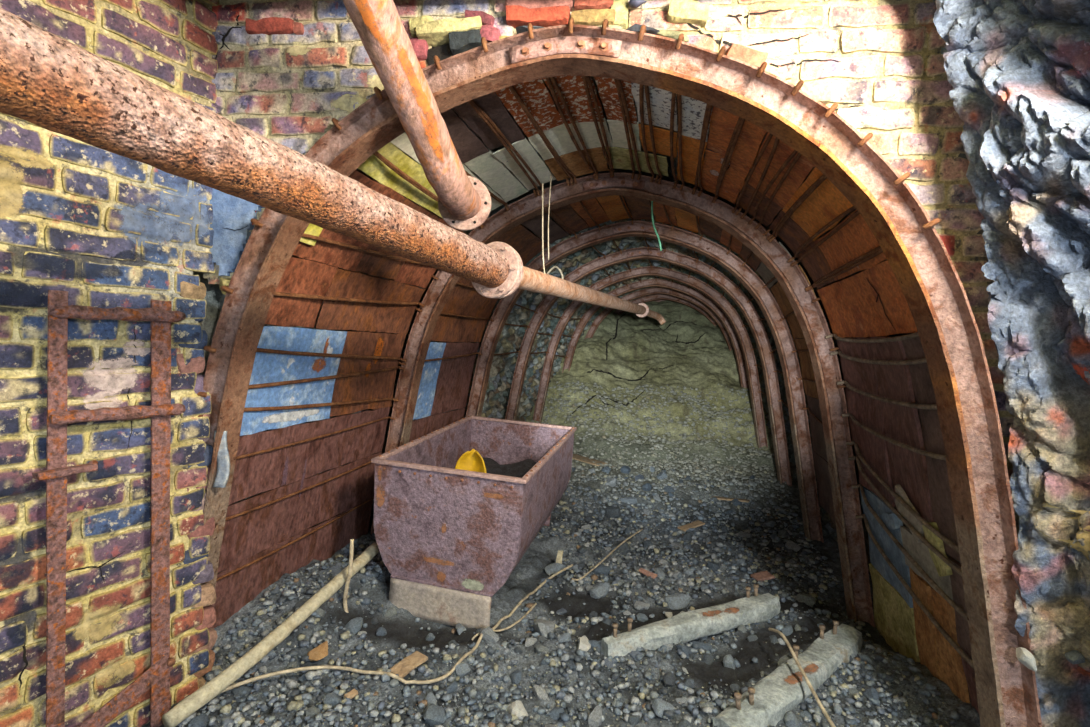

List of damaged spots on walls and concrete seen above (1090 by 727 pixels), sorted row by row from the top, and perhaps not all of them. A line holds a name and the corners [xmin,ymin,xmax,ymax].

crack [215,15,241,60]